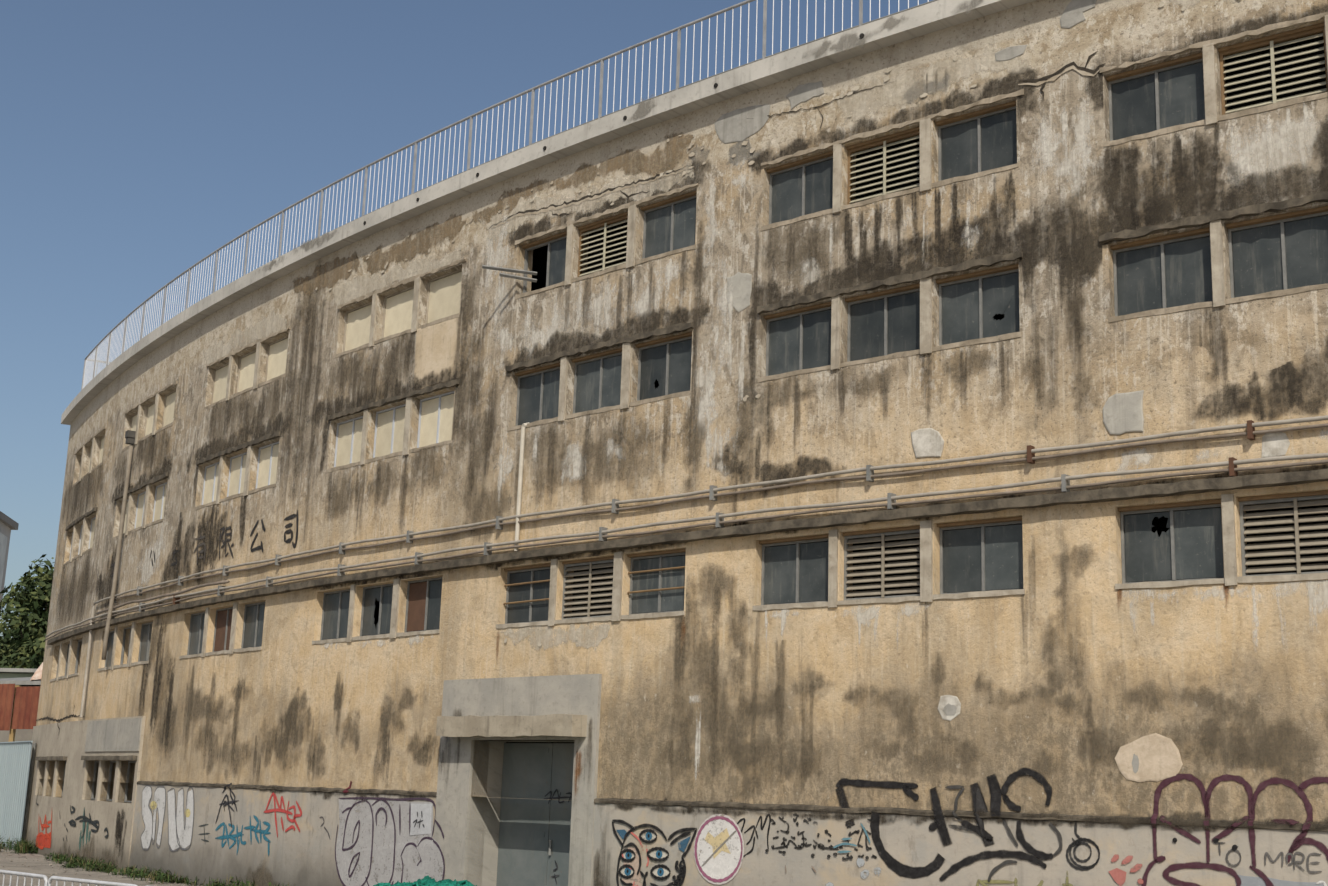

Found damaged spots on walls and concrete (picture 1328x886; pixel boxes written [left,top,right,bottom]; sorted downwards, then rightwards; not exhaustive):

crack [1018,51,1106,98]
leakage [1128,5,1328,62]
peeling [294,133,709,307]
leakage [486,69,1328,529]
leakage [187,279,518,539]
leakage [1057,549,1089,619]
leakage [139,496,324,793]
leakage [335,681,358,750]
leakage [376,690,414,761]
leakage [669,567,815,785]
leakage [1174,694,1311,780]
leakage [313,789,378,800]